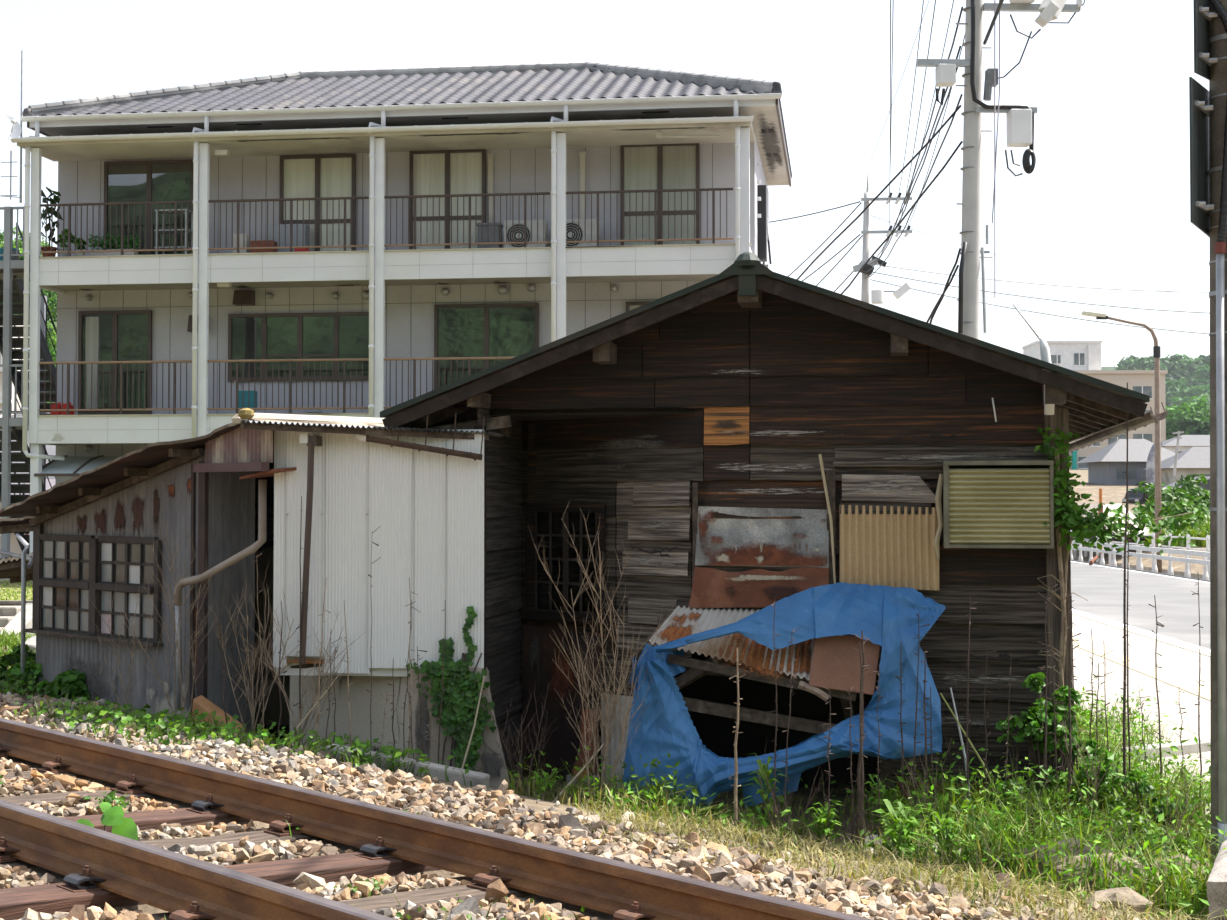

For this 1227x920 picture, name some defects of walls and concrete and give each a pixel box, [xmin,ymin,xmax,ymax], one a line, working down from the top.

damp [760,119,782,171]
corrosion [698,510,827,566]
corrosion [764,586,797,599]
corrosion [660,612,701,642]
corrosion [719,633,813,678]